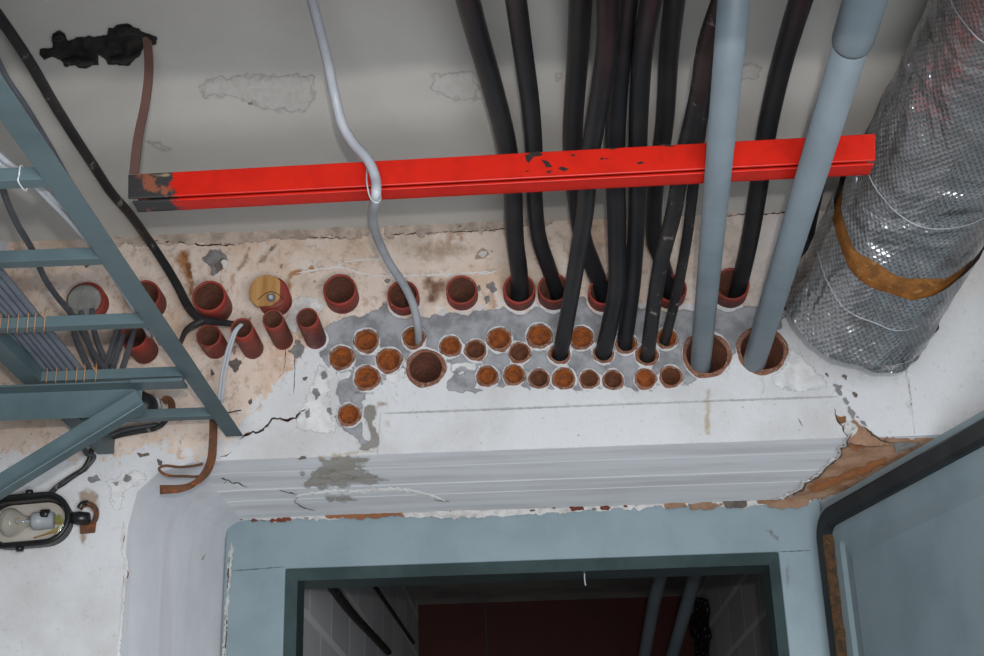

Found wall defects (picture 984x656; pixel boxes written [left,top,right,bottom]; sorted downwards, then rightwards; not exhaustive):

spalling [202,250,228,276]
crack [218,349,306,488]
water stain [301,403,383,501]
spalling [240,351,933,523]
corrosion [823,534,847,656]